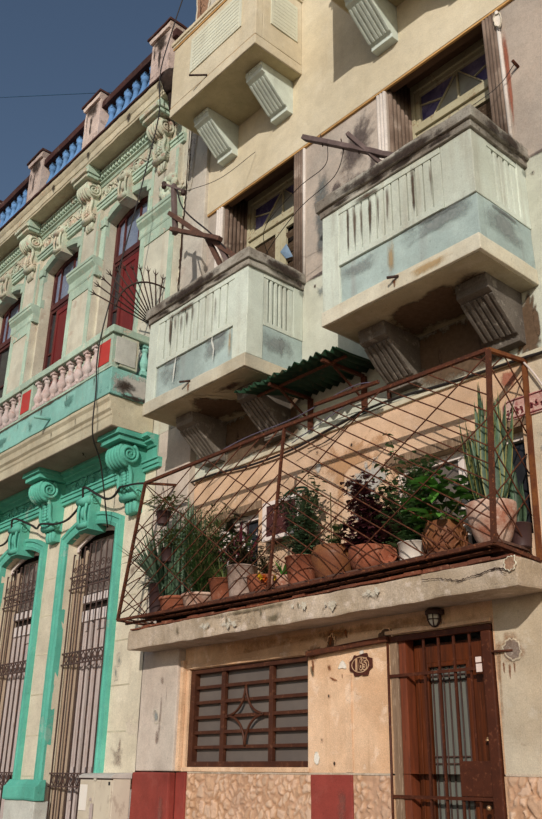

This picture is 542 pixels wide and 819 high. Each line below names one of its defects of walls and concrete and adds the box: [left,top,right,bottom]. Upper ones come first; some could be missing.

damp [342,119,369,170]
damp [315,129,450,247]
damp [421,203,467,235]
damp [494,205,519,243]
damp [416,257,441,273]
damp [532,309,540,336]
damp [207,331,225,355]
damp [113,373,146,403]
crack [421,567,506,583]
spalling [503,555,517,572]
spalling [501,637,522,662]